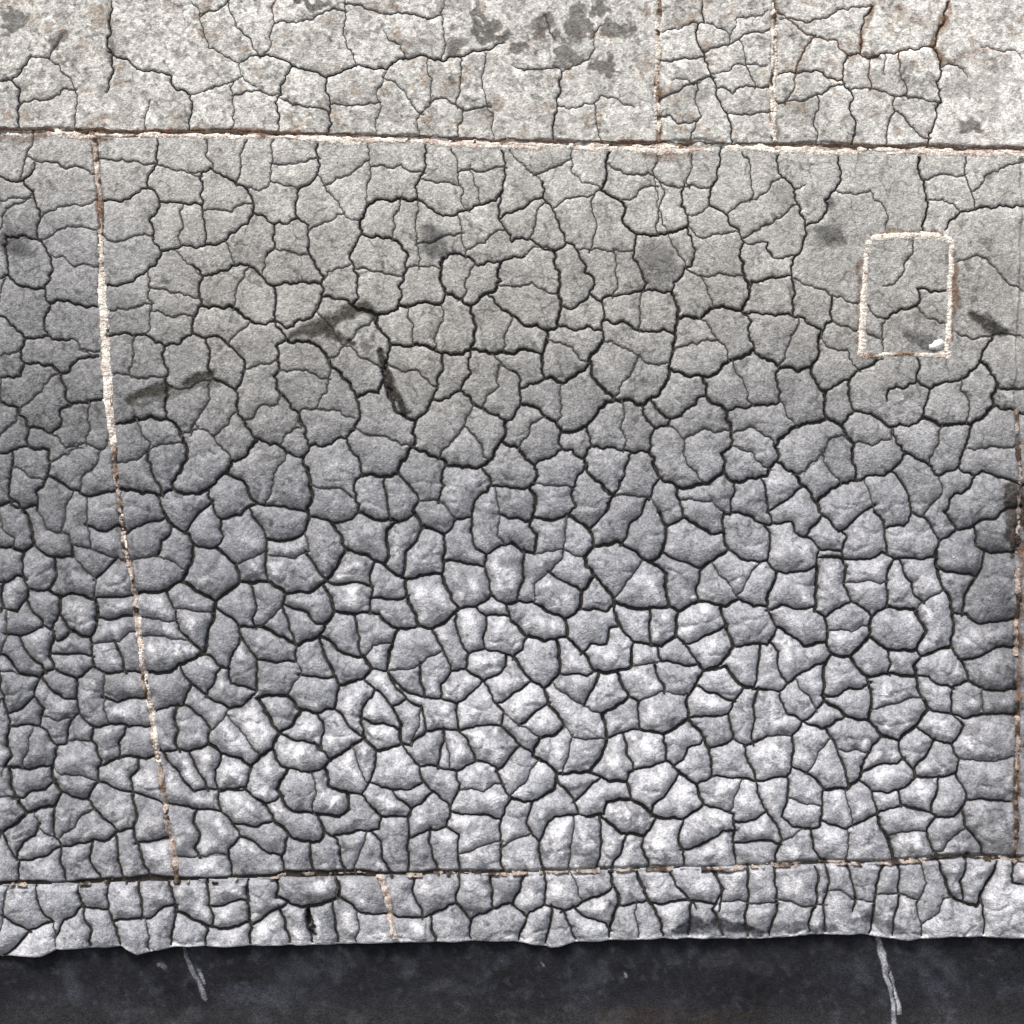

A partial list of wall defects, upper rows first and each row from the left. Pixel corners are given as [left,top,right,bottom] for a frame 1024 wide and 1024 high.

crack [1,36,78,130]
crack [107,0,504,142]
crack [512,25,634,142]
crack [658,1,770,147]
crack [774,1,968,148]
crack [0,130,1024,943]